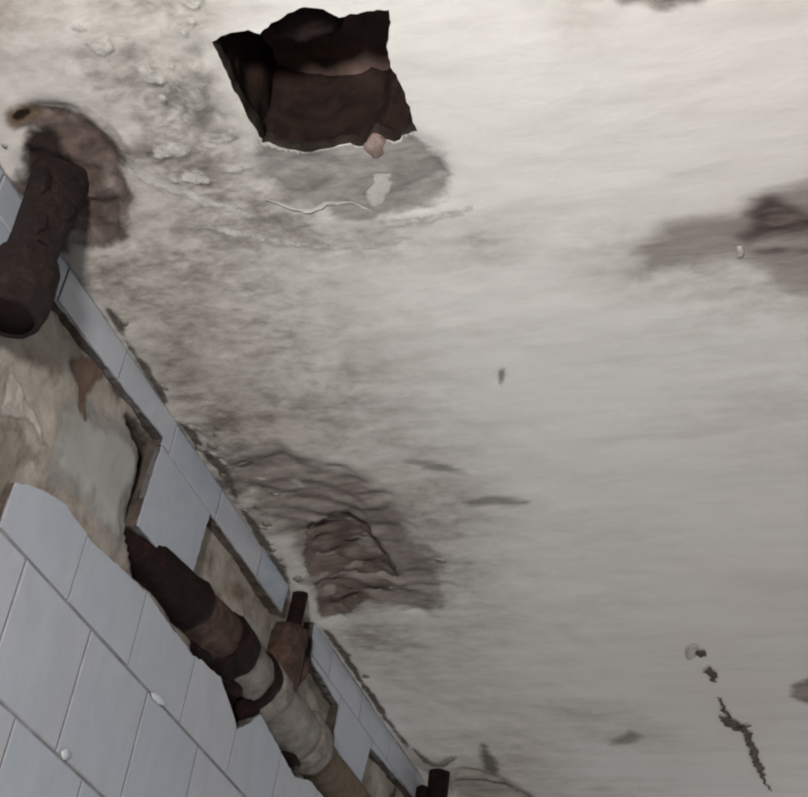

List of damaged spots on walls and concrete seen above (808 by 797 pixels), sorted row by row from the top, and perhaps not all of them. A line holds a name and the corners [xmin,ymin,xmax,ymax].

flaking render [137,60,237,143]
flaking render [212,38,467,227]
flaking render [202,223,375,250]
leakage [645,189,808,290]
flaking render [0,372,44,443]
flaking render [233,448,446,616]
crack [685,644,772,791]
flaking render [413,745,531,797]